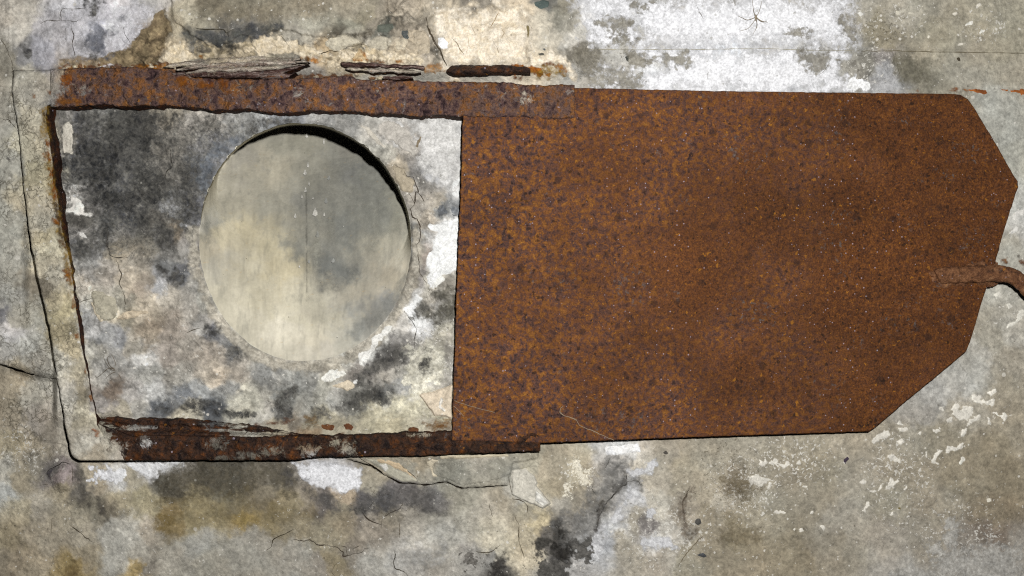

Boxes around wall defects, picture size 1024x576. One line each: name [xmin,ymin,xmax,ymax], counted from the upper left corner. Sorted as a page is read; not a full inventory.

rust [512,63,567,79]
leakage [397,118,463,193]
crack [106,224,131,308]
mould [410,286,456,324]
leakage [382,341,450,422]
crack [0,359,117,487]
rust [304,416,353,431]
rust [408,419,451,432]
crack [348,458,528,572]
leakage [532,456,658,576]
leakage [639,490,699,550]
leakage [459,552,507,576]